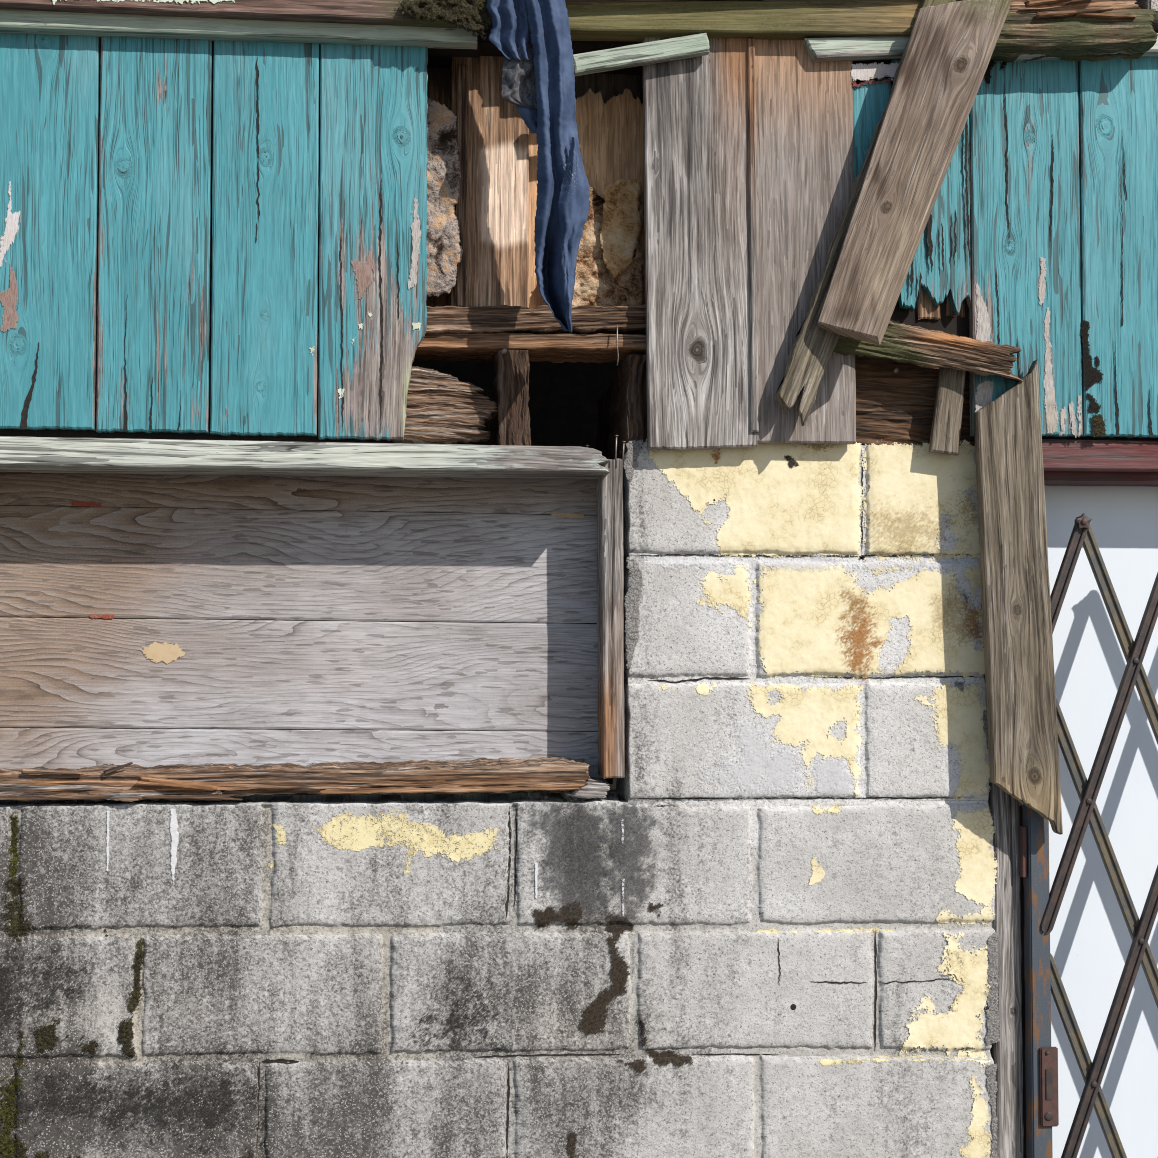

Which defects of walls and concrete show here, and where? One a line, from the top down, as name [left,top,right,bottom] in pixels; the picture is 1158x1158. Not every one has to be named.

peeling [0,181,21,332]
peeling [351,250,376,299]
peeling [408,197,421,289]
peeling [1038,256,1082,438]
corrosion [839,591,883,680]
peeling [268,823,286,868]
peeling [309,810,499,874]
peeling [624,439,1001,1158]
damp [528,795,664,1036]
damp [618,1018,693,1075]